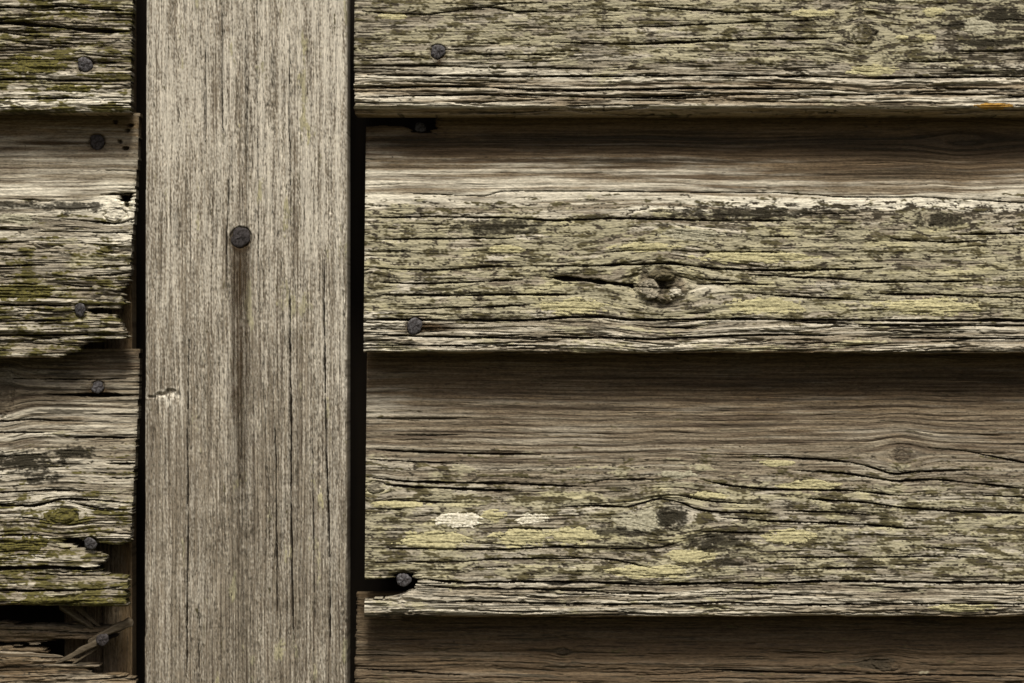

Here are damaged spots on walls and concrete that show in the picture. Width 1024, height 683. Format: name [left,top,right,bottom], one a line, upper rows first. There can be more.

crack [371,191,1024,347]
crack [371,418,1024,606]